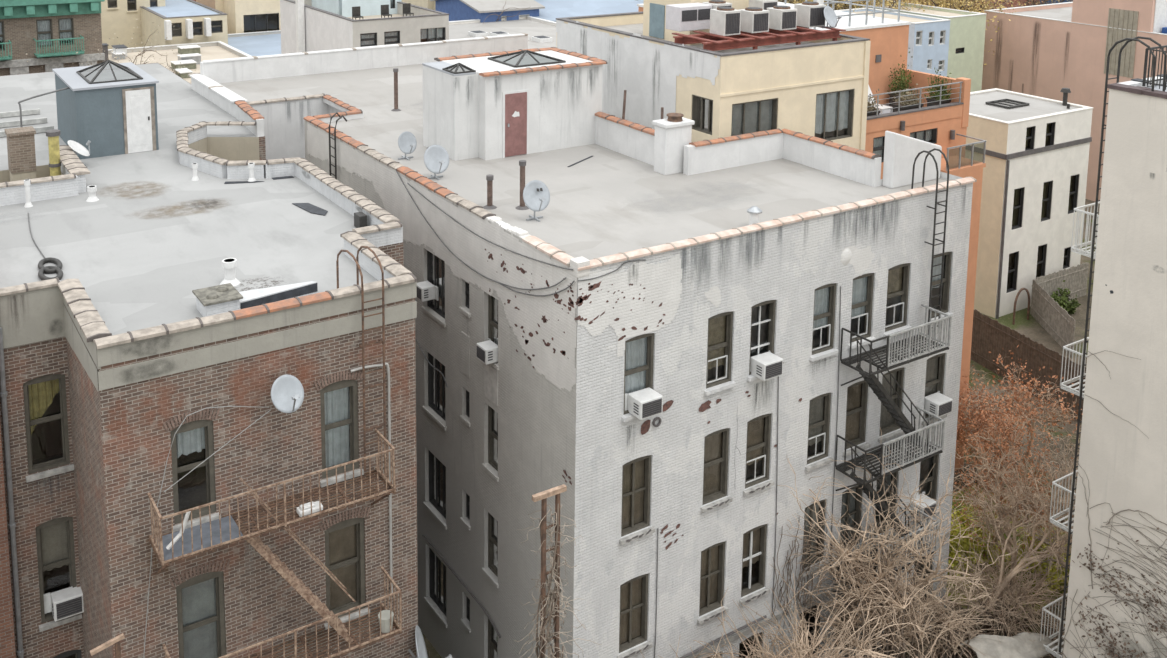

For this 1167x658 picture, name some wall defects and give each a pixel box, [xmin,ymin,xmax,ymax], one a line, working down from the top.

peeling [307,121,682,391]
spalling [641,420,651,435]
peeling [626,524,684,550]